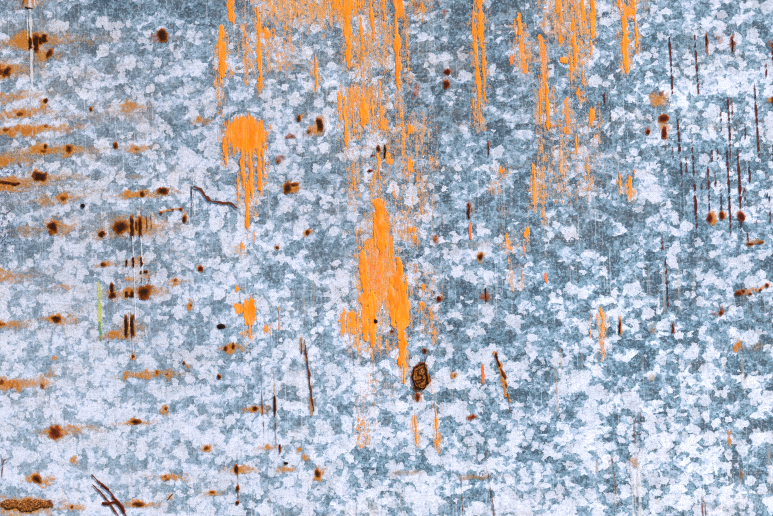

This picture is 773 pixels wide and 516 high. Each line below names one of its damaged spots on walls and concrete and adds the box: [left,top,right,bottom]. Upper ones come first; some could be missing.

rust [0,30,76,79]
rust [307,116,324,135]
rust [649,32,764,248]
rust [96,207,187,239]
rust [103,314,140,343]
rust [492,351,512,412]
rust [0,495,53,516]